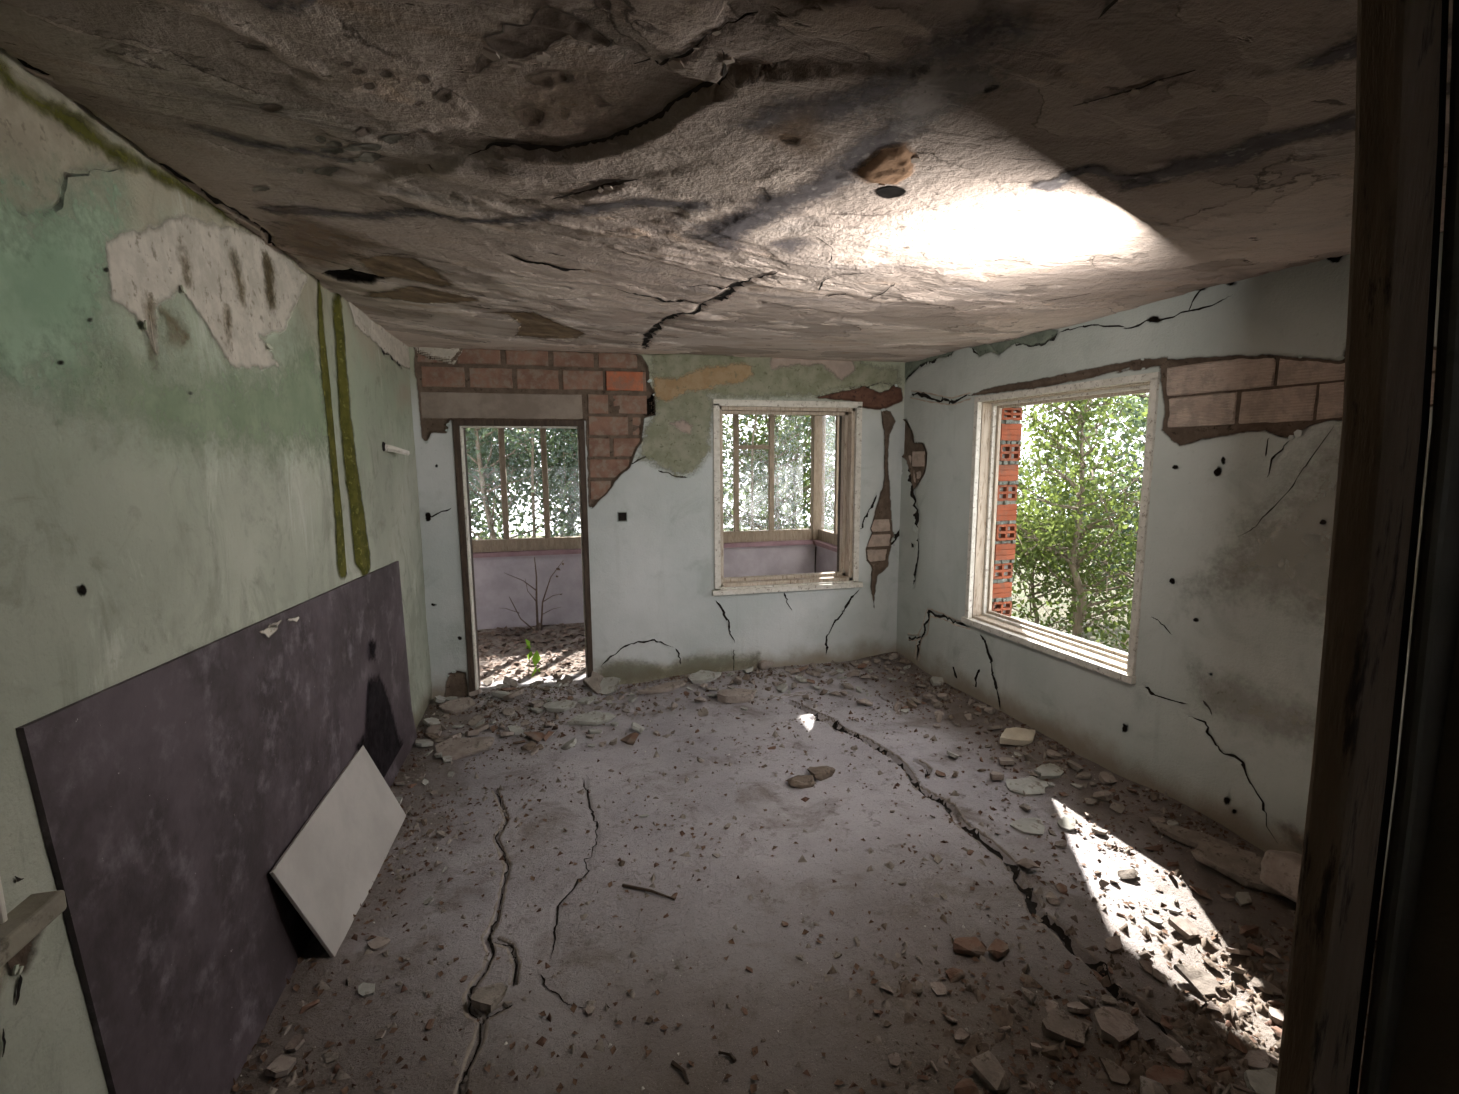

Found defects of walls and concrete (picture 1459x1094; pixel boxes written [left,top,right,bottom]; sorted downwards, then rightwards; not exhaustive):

damp [0,179,371,576]
flaking render [106,215,655,509]
damp [260,13,1032,250]
crack [615,272,777,349]
damp [773,239,807,253]
flaking render [770,351,953,607]
crack [861,468,1000,707]
peeling [971,329,1058,357]
flaking render [972,349,1346,446]
crack [453,784,599,1094]
crack [761,692,1193,1049]
crack [1145,687,1277,842]